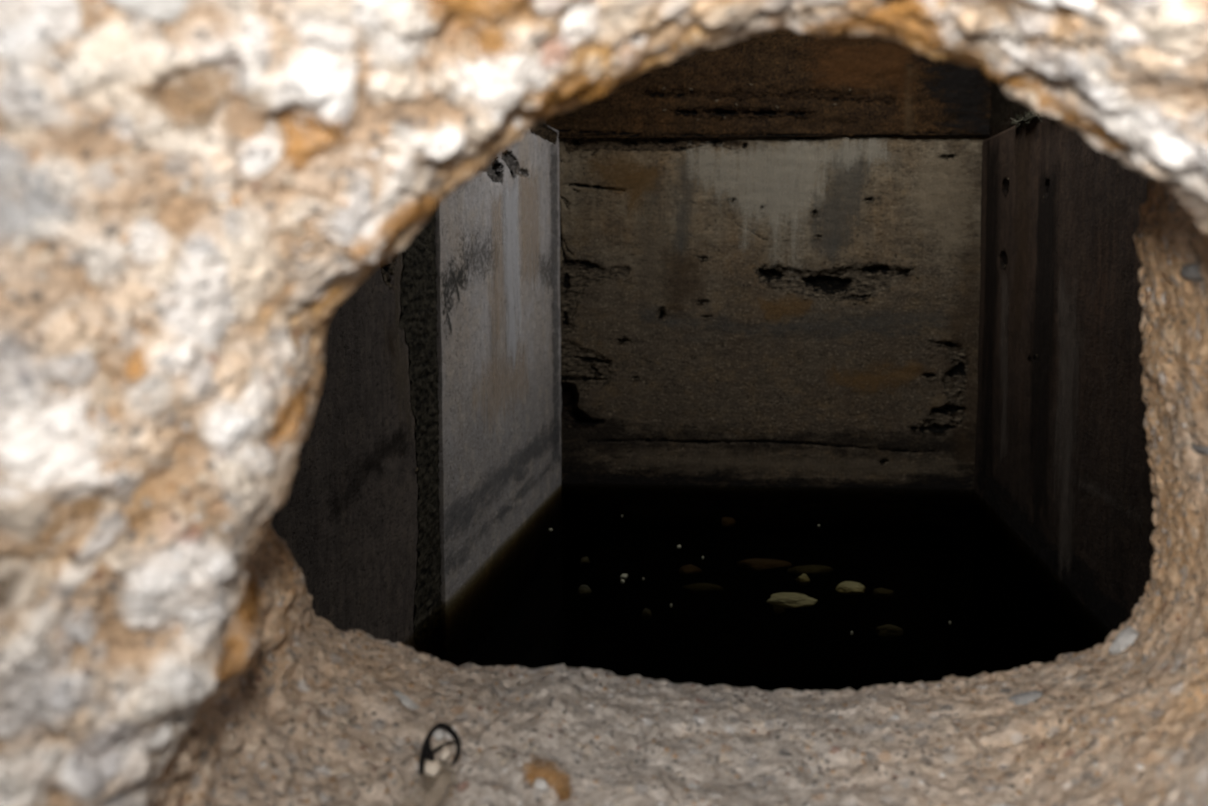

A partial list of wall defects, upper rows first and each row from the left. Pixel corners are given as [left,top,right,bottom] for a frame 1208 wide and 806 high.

rust [534,73,617,118]
peeling [483,150,531,184]
spalling [753,262,919,305]
spalling [380,209,451,652]
spalling [560,255,633,429]
water stain [441,139,1129,637]
spalling [910,341,969,434]